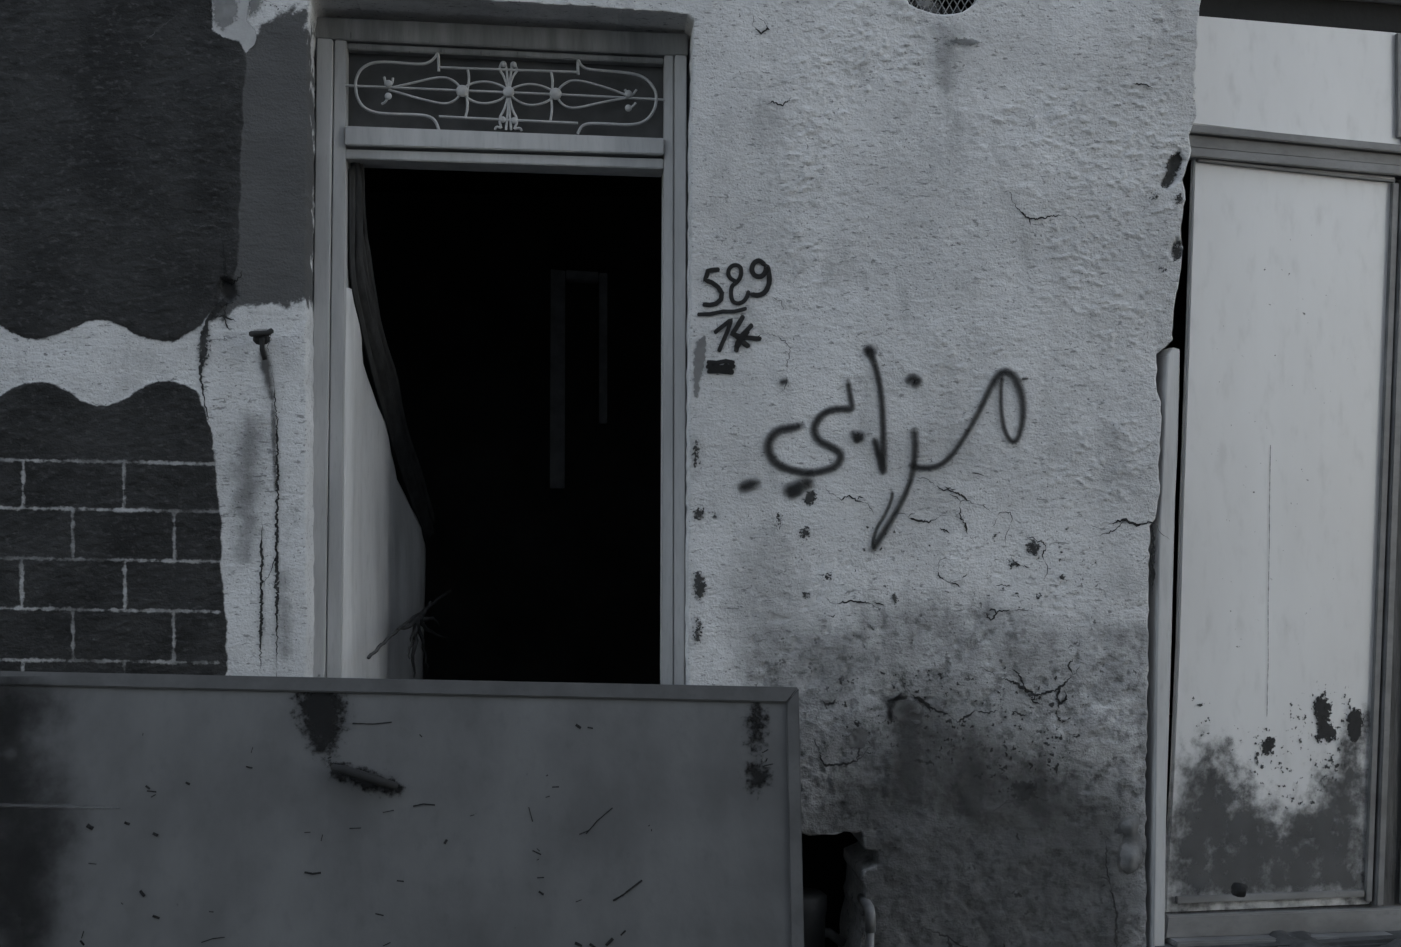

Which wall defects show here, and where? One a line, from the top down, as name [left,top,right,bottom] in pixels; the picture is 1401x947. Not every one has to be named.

peeling [212,0,287,53]
crack [1010,192,1083,225]
crack [1093,518,1169,594]
crack [902,660,1079,727]